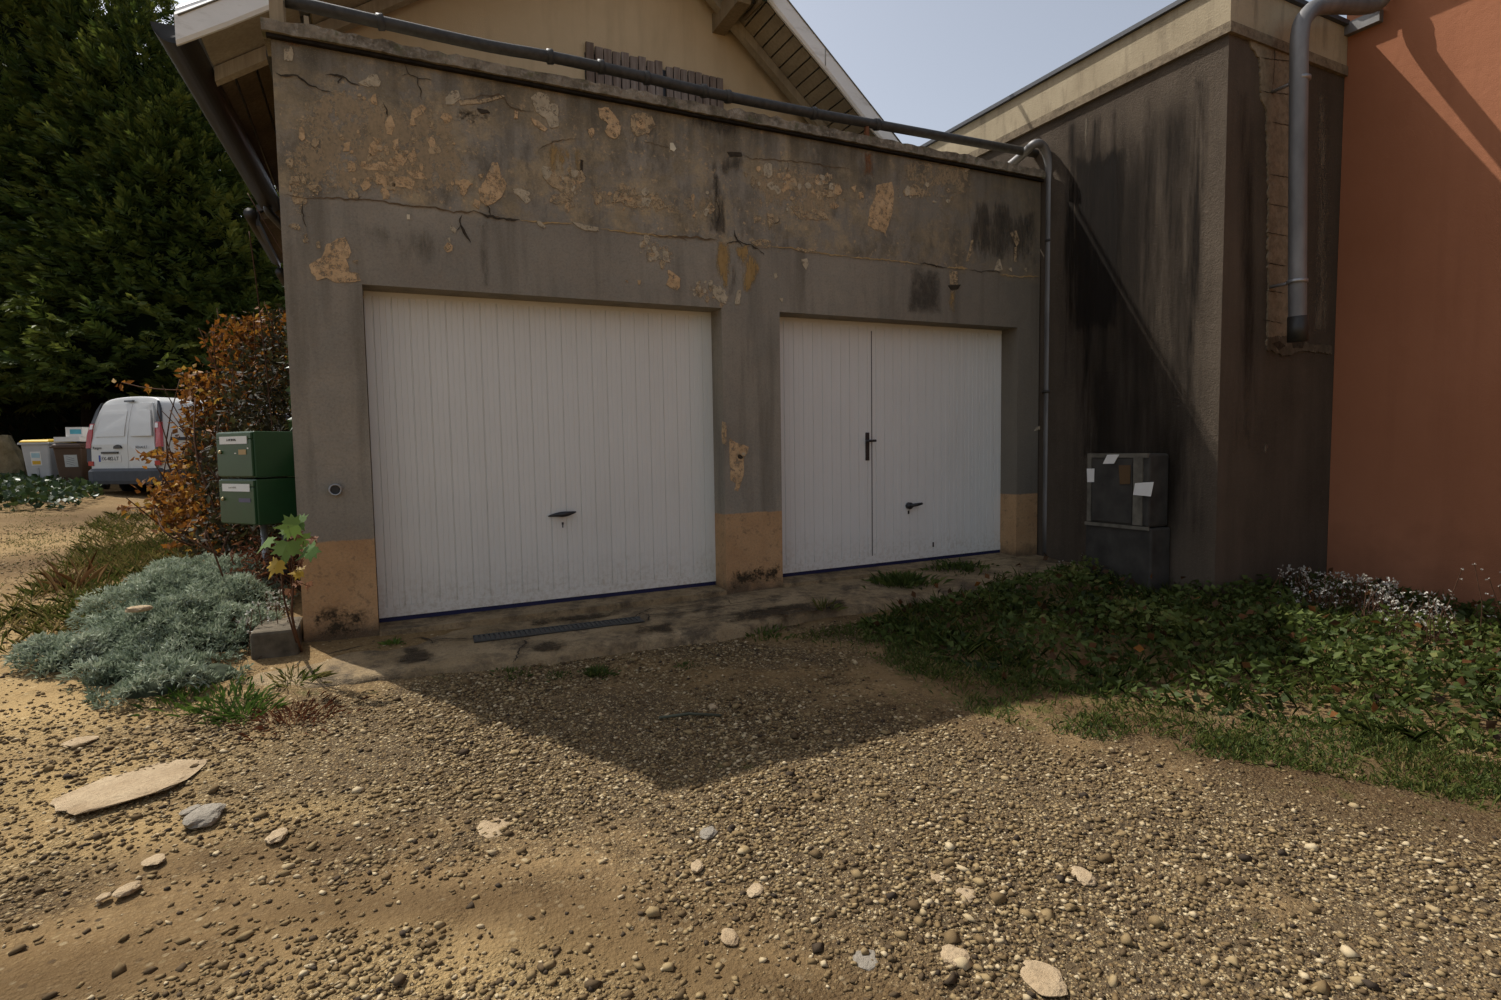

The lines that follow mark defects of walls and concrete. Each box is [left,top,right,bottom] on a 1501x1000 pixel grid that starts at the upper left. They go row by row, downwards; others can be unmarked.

peeling [446,90,505,114]
peeling [514,92,559,132]
peeling [588,107,656,139]
peeling [289,166,361,283]
peeling [473,162,530,209]
crack [286,183,1038,278]
peeling [727,152,954,233]
damp [1065,120,1199,508]
peeling [722,421,749,491]